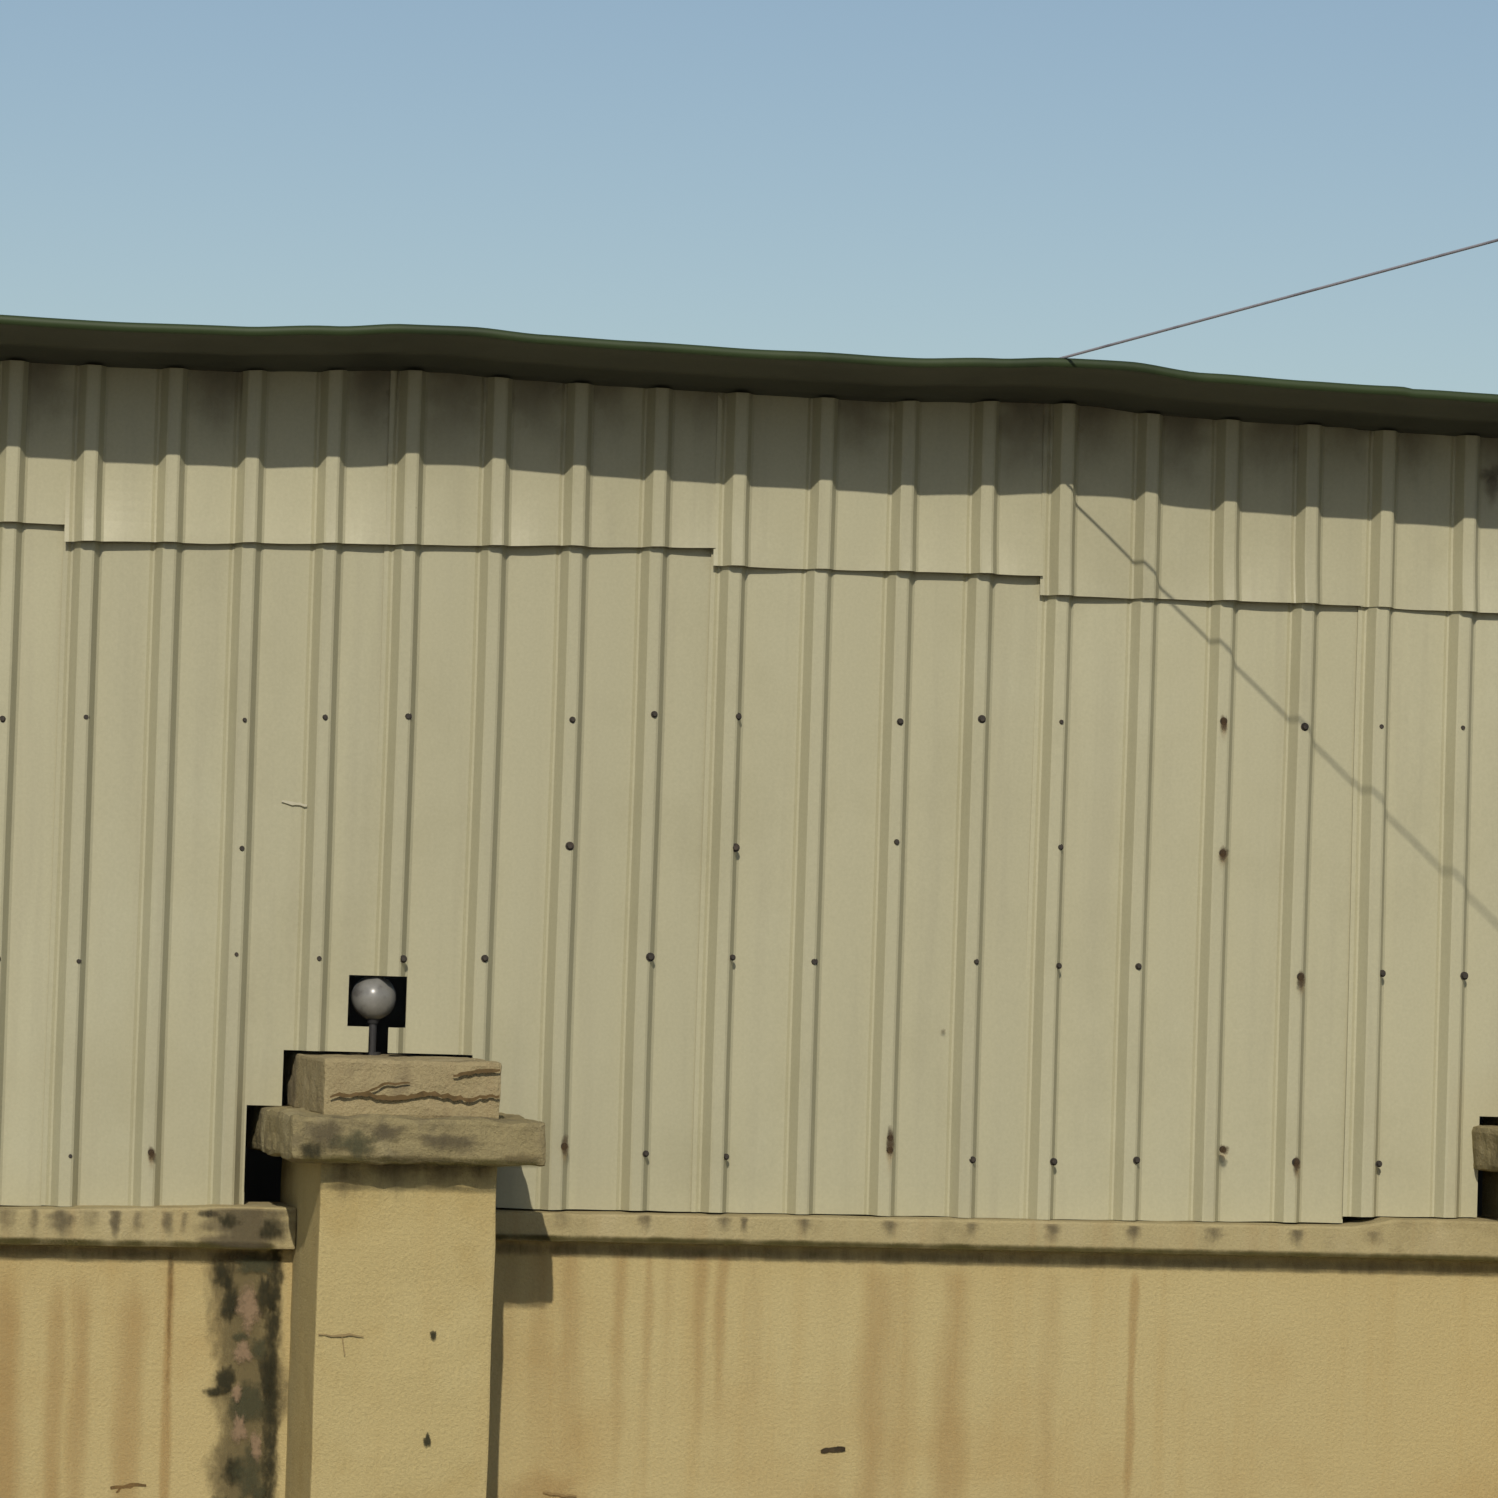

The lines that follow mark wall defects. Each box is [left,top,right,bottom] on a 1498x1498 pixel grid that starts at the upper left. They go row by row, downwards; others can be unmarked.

water stain [301,1126,537,1171]
water stain [0,1208,285,1498]